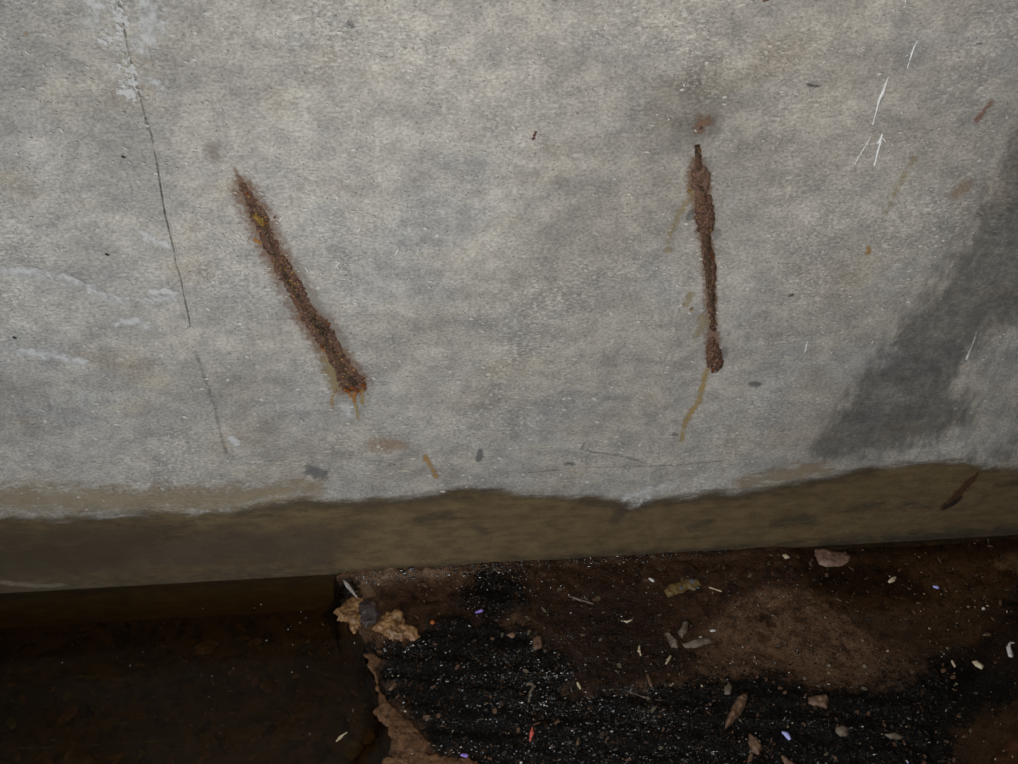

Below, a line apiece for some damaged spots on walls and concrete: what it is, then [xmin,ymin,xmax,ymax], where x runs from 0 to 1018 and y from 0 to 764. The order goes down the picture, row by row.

crack [122,23,193,326]
water stain [0,149,1018,628]